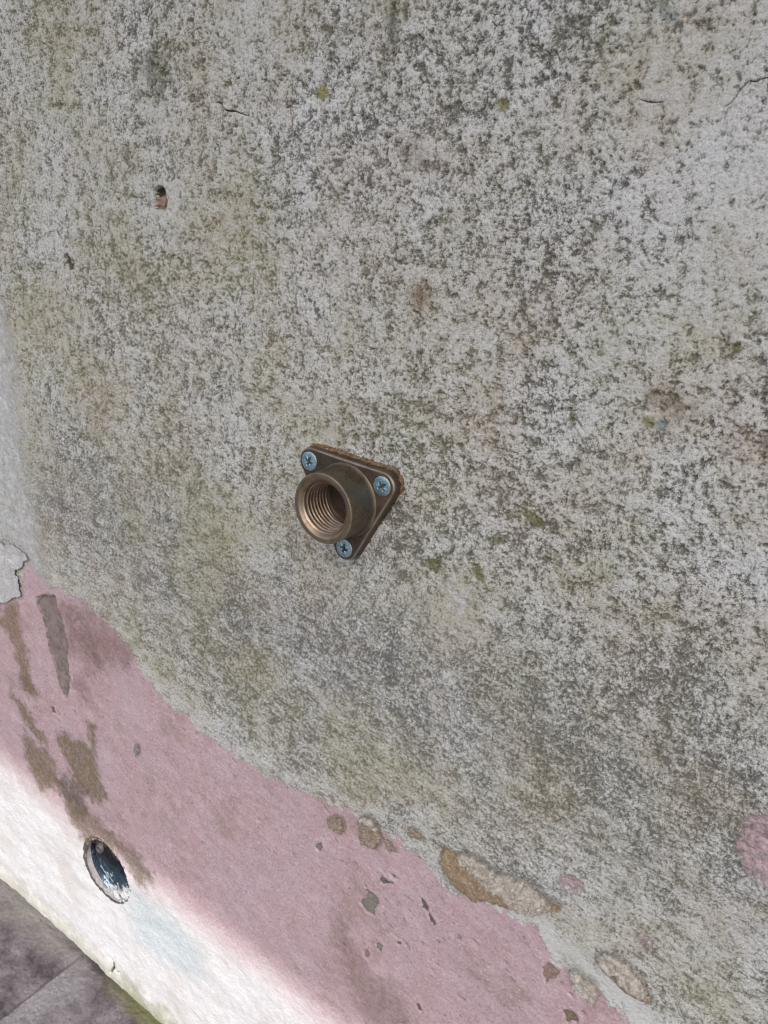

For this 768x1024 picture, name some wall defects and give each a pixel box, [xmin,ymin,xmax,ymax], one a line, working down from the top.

peeling [0,543,28,603]
water stain [0,606,37,694]
water stain [13,695,150,885]
peeling [361,889,379,915]
peeling [543,963,559,981]